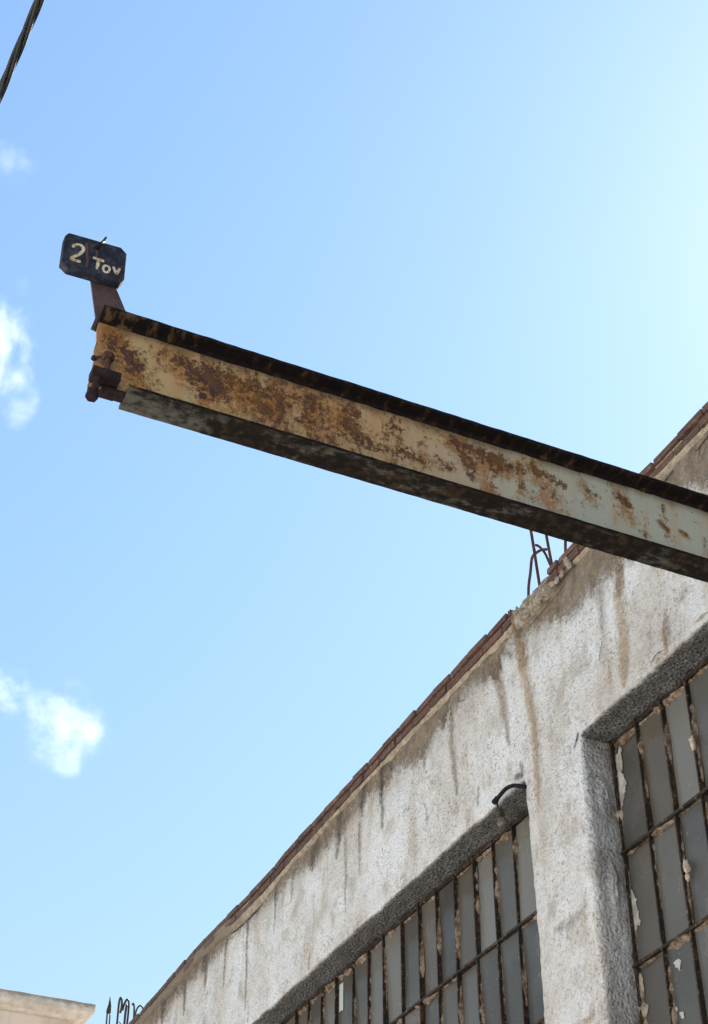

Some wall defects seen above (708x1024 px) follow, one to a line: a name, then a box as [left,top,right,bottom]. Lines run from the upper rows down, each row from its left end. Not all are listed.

rust [102,328,147,389]
rust [163,353,568,510]
rust [615,492,635,525]
spalling [511,556,572,632]
damp [144,549,622,1024]
peeling [615,745,627,809]
peeling [631,889,641,932]